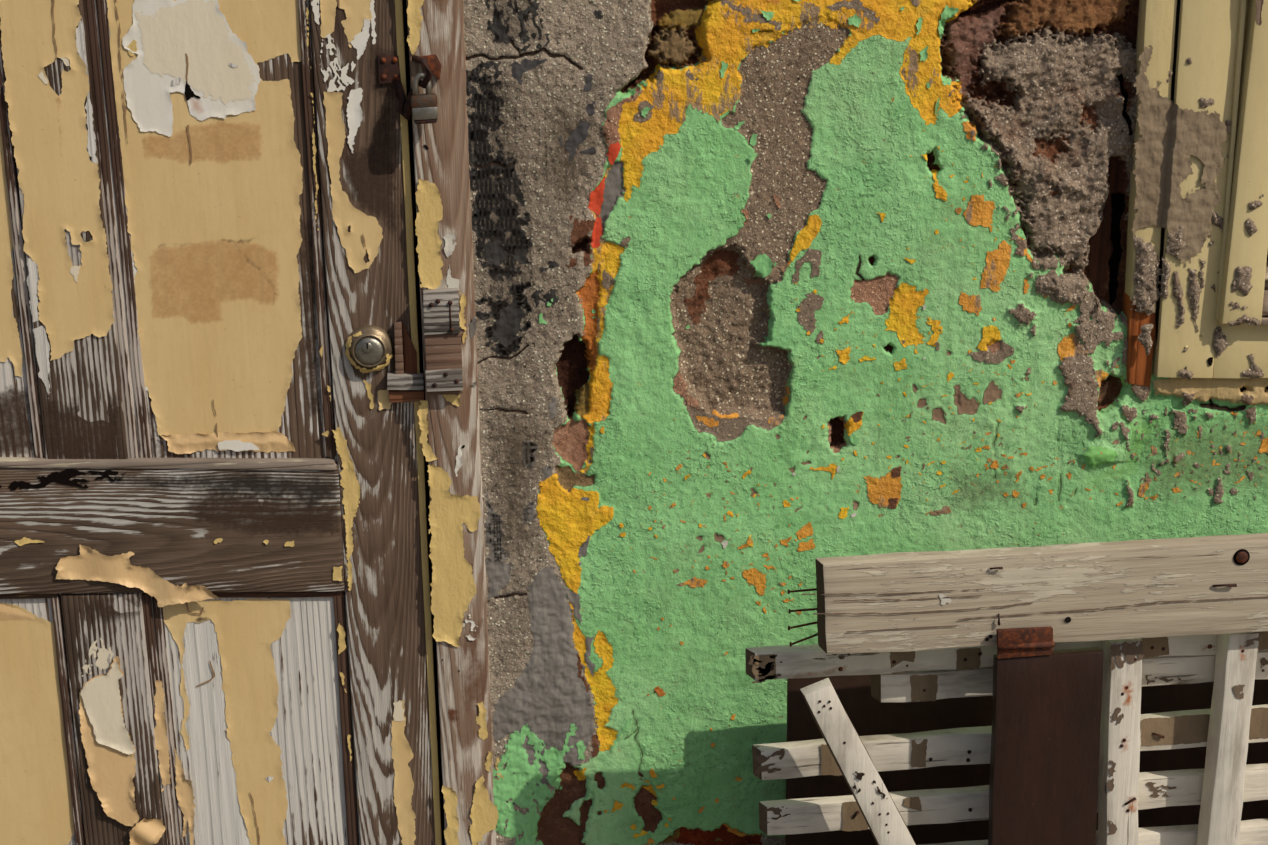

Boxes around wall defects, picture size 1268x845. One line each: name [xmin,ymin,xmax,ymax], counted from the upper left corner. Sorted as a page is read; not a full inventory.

crack [466,40,583,70]
crack [1117,74,1132,135]
peeling [106,0,303,453]
peeling [415,178,443,289]
peeling [1101,407,1268,502]
crack [1200,399,1246,412]
peeling [417,400,512,647]
peeling [0,603,166,845]
peeling [55,545,291,845]